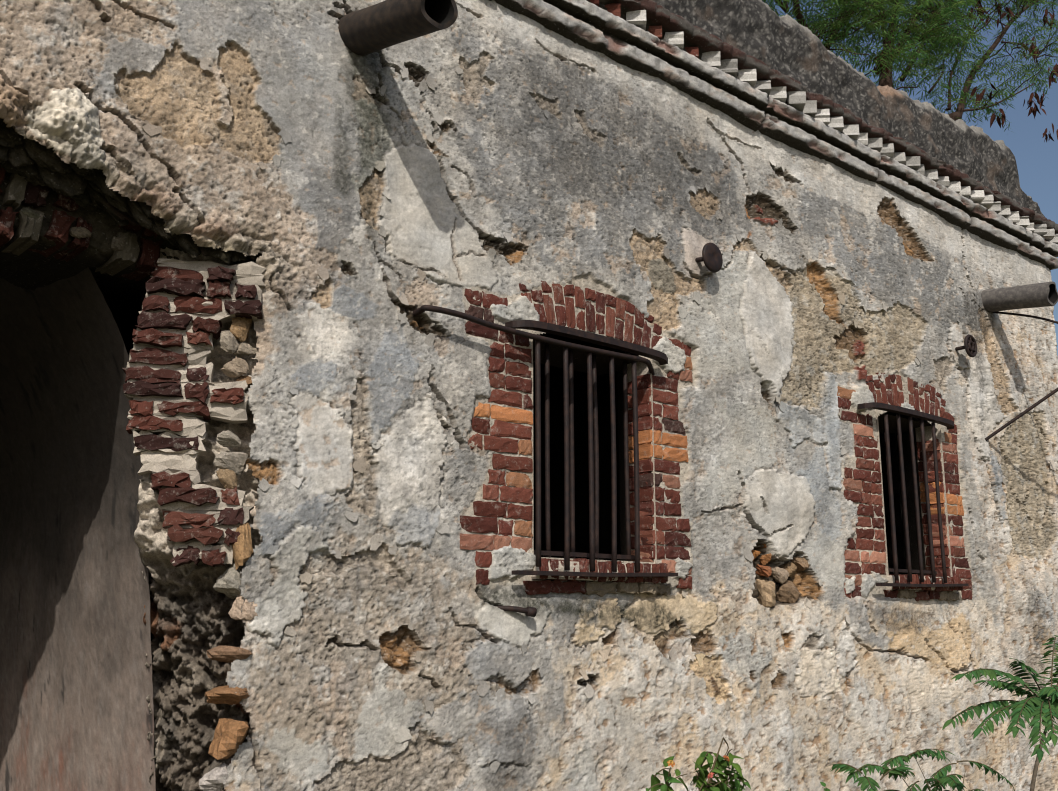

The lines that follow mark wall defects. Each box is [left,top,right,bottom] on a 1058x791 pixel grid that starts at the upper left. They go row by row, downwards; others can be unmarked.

spalling [113,39,292,170]
crack [374,50,528,305]
spalling [677,152,723,221]
spalling [744,191,799,236]
spalling [769,155,803,186]
spalling [876,196,935,264]
spalling [629,227,1058,561]
spalling [744,539,826,610]
crack [850,605,983,688]
flaking render [313,586,552,791]